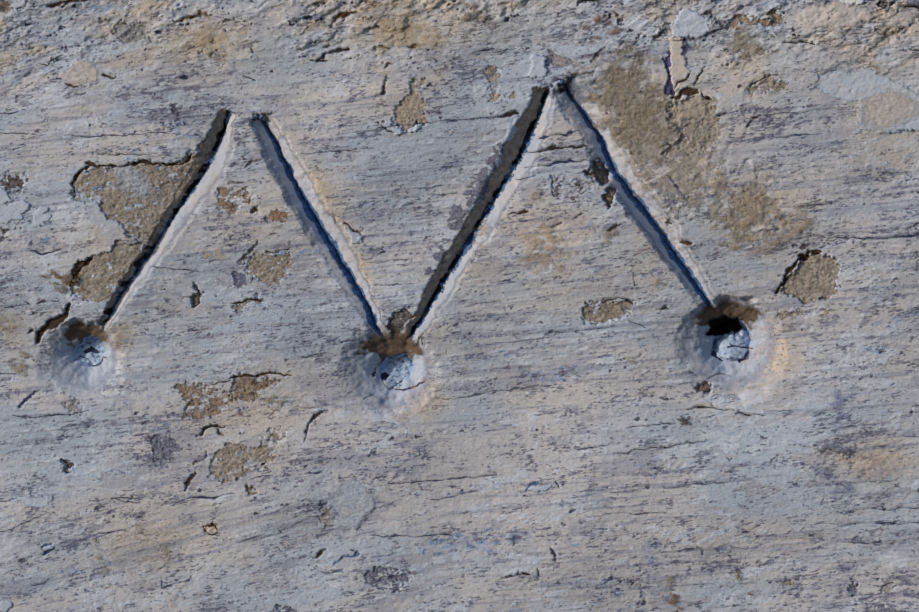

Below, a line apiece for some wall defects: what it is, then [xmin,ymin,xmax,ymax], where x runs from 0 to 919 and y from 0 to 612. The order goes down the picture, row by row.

spalling [378,78,430,136]
spalling [70,141,205,303]
spalling [231,294,266,312]
spalling [232,249,293,288]
spalling [581,298,633,325]
spalling [775,250,841,320]
spalling [172,371,292,419]
spalling [210,429,286,495]